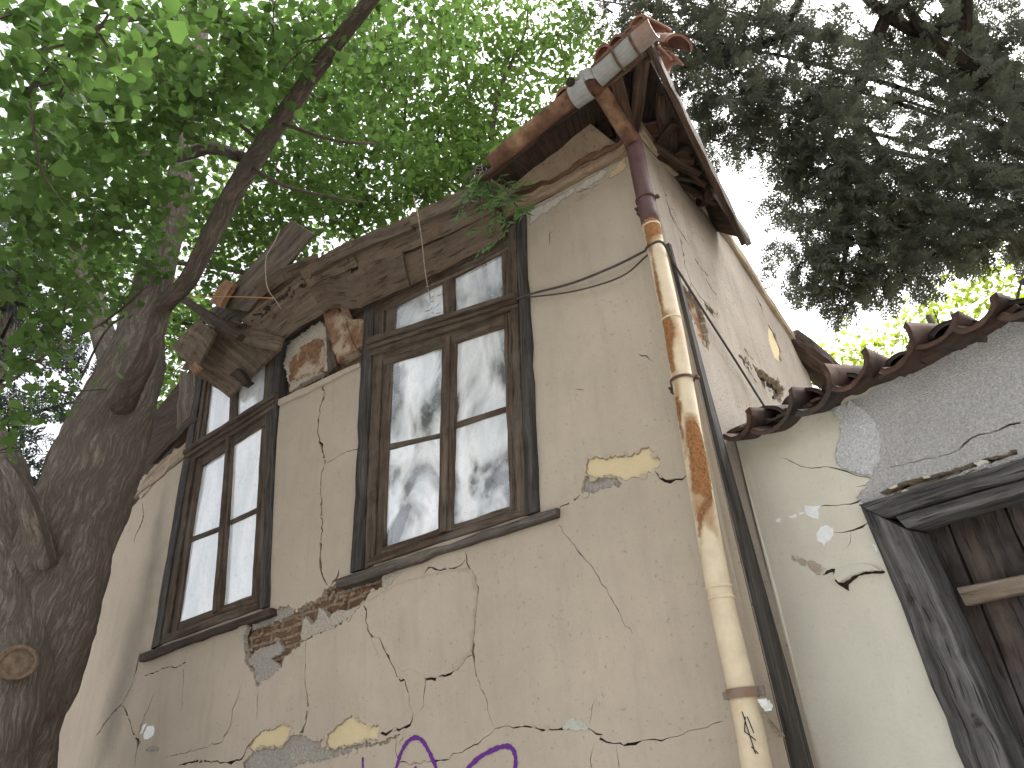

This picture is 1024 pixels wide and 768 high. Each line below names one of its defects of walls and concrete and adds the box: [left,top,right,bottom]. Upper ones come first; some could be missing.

rust [654,267,675,372]
flaking render [738,347,785,404]
crack [317,368,357,586]
peeling [581,446,661,498]
rust [675,397,713,530]
crack [782,457,871,546]
peeling [831,401,882,475]
crack [962,421,1024,447]
flaking render [237,570,402,687]
crack [172,686,258,768]
peeling [241,715,403,768]
crack [364,606,722,768]